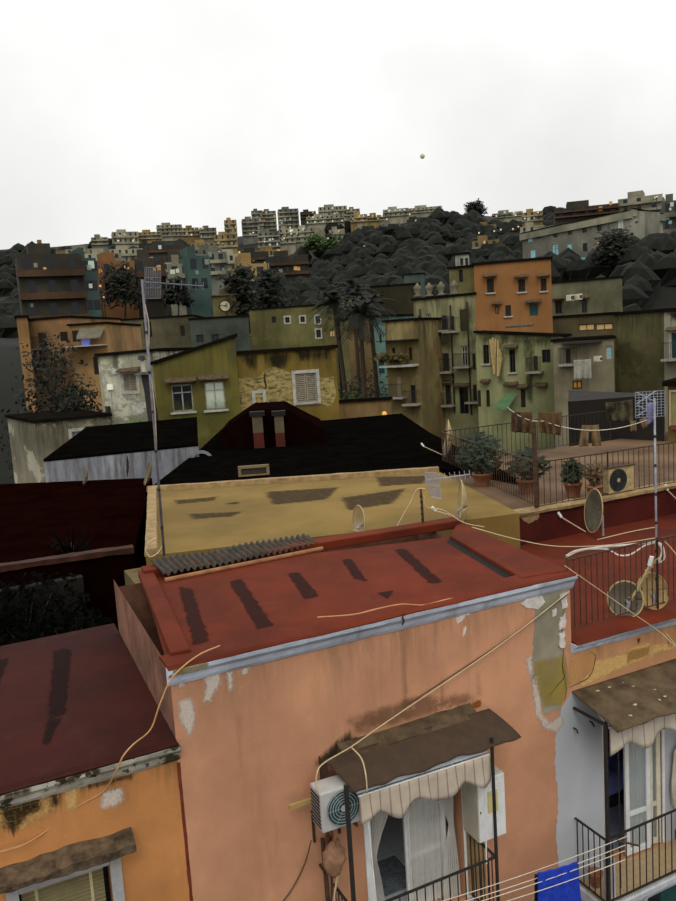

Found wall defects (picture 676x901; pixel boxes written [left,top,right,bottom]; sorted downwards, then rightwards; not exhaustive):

peeling [203,667,249,702]
peeling [521,589,568,732]
peeling [177,698,195,735]
leakage [0,776,76,835]